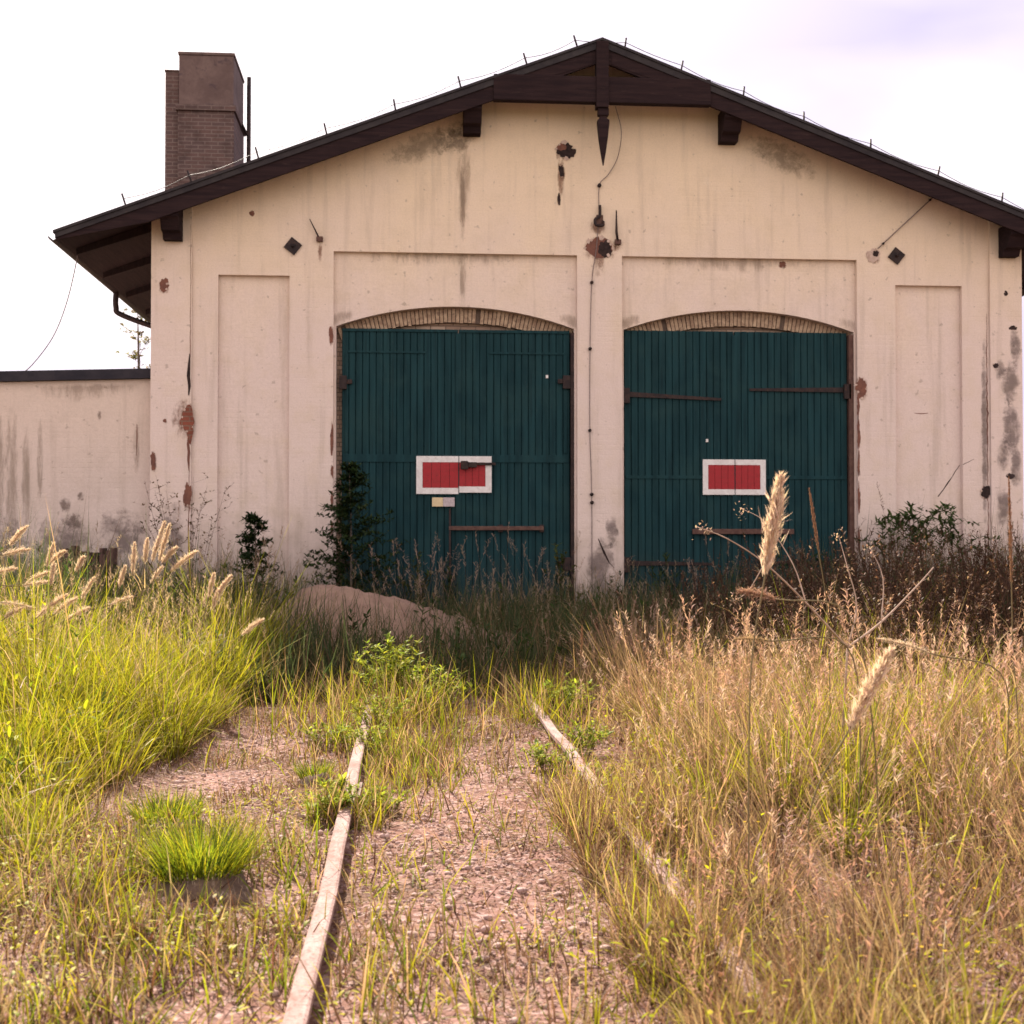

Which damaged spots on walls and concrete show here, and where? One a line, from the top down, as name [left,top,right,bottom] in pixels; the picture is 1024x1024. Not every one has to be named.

flaking render [555,140,576,178]
flaking render [584,235,614,263]
flaking render [163,403,194,445]
peeling [854,377,867,515]
flaking render [183,482,192,507]